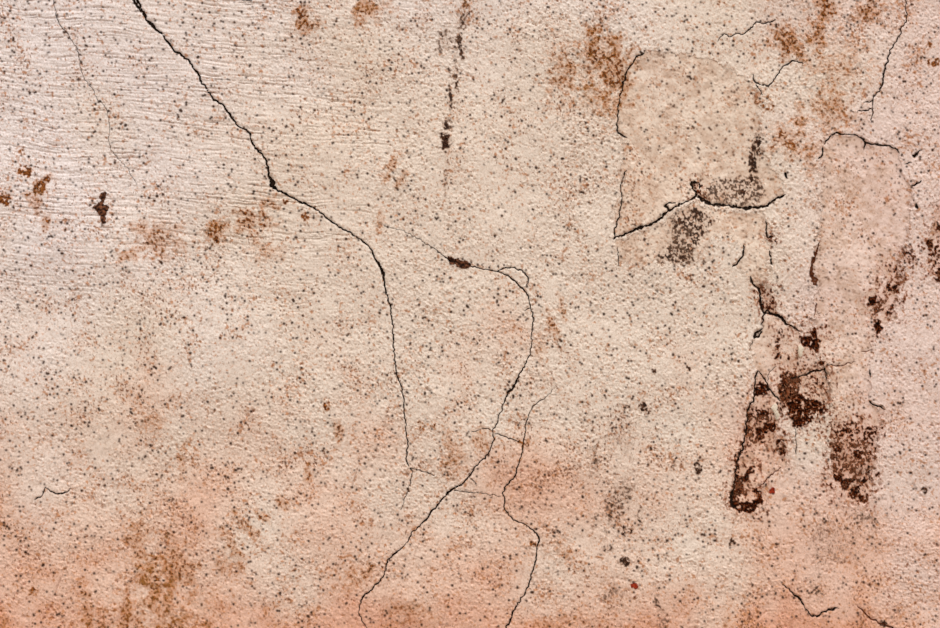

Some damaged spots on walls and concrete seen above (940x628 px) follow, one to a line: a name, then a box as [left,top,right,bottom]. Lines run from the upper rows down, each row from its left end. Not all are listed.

rust [548,11,639,116]
crack [616,53,644,138]
crack [718,19,776,40]
crack [753,60,803,95]
crack [818,0,922,209]
crack [133,0,553,628]
spalling [612,50,940,521]